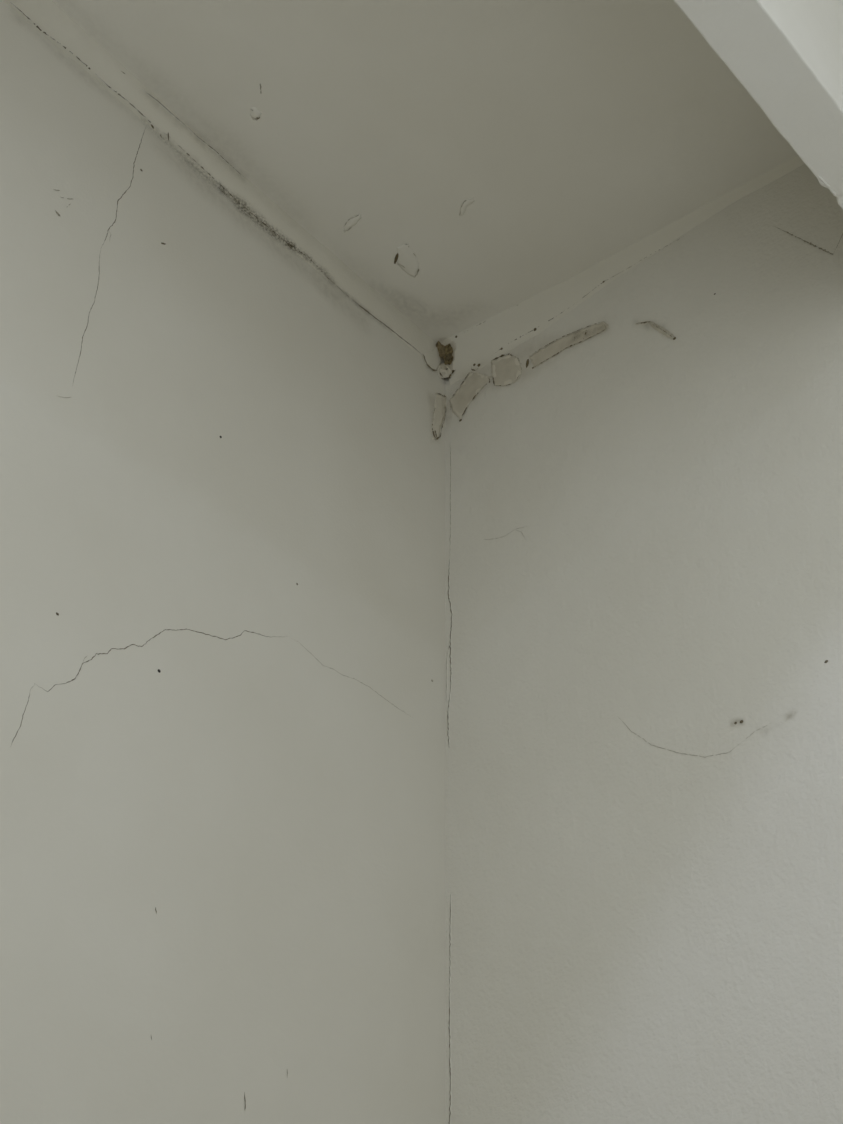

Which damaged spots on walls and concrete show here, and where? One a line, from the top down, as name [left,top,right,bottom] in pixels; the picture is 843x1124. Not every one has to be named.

crack [10,2,422,398]
peeling [422,321,609,440]
crack [9,628,413,748]